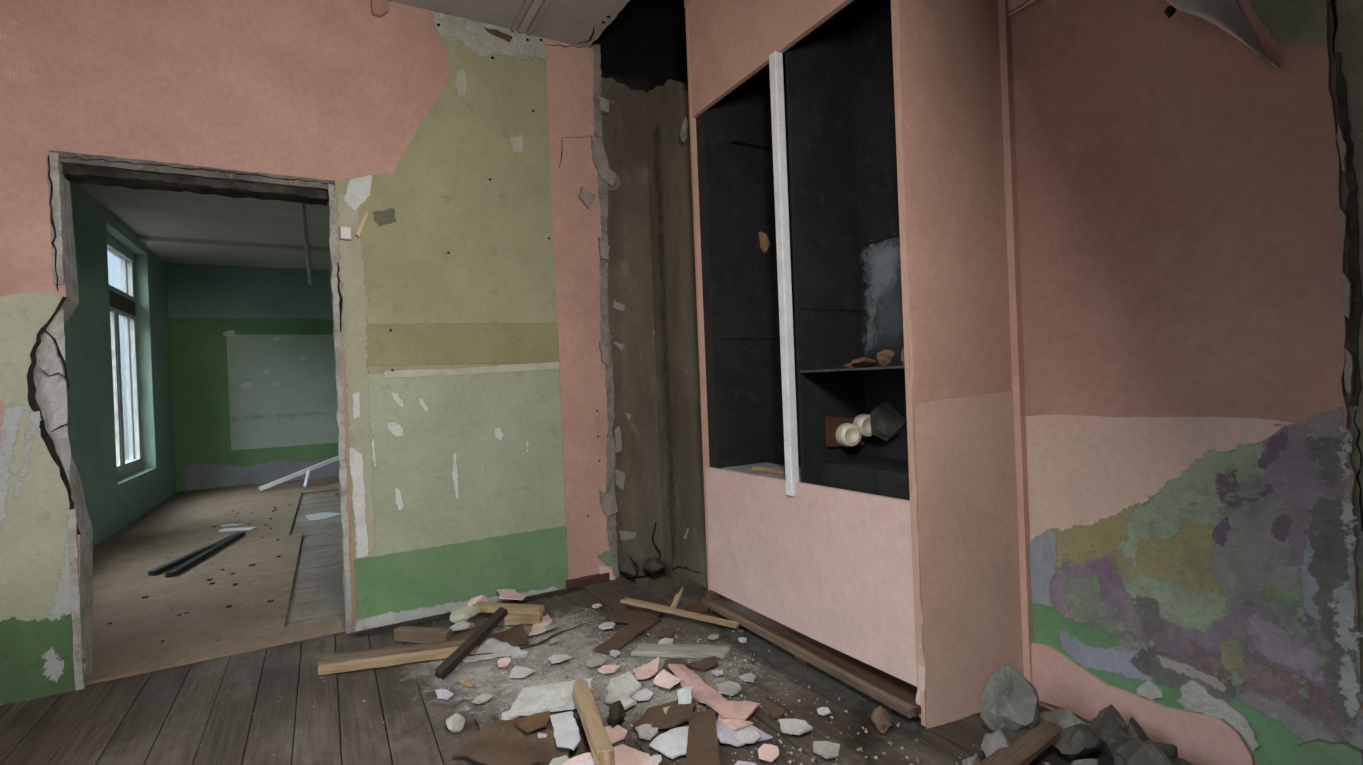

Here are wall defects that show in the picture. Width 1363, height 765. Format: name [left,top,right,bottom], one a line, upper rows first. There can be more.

peeling [1249,0,1328,45]
crack [1330,0,1338,53]
peeling [0,290,89,705]
peeling [182,11,568,631]
spalling [578,0,688,578]
peeling [1029,407,1363,765]